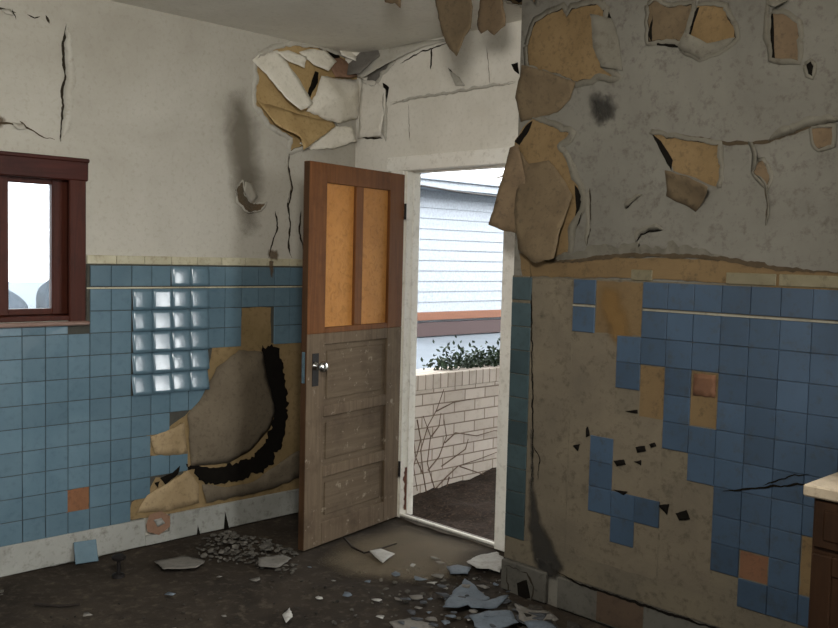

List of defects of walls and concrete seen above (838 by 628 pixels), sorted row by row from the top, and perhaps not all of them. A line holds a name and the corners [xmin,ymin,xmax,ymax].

crack [0,7,76,142]
peeling [252,39,445,155]
crack [270,149,303,255]
peeling [511,0,838,596]
peeling [130,307,301,527]
crack [725,474,808,492]